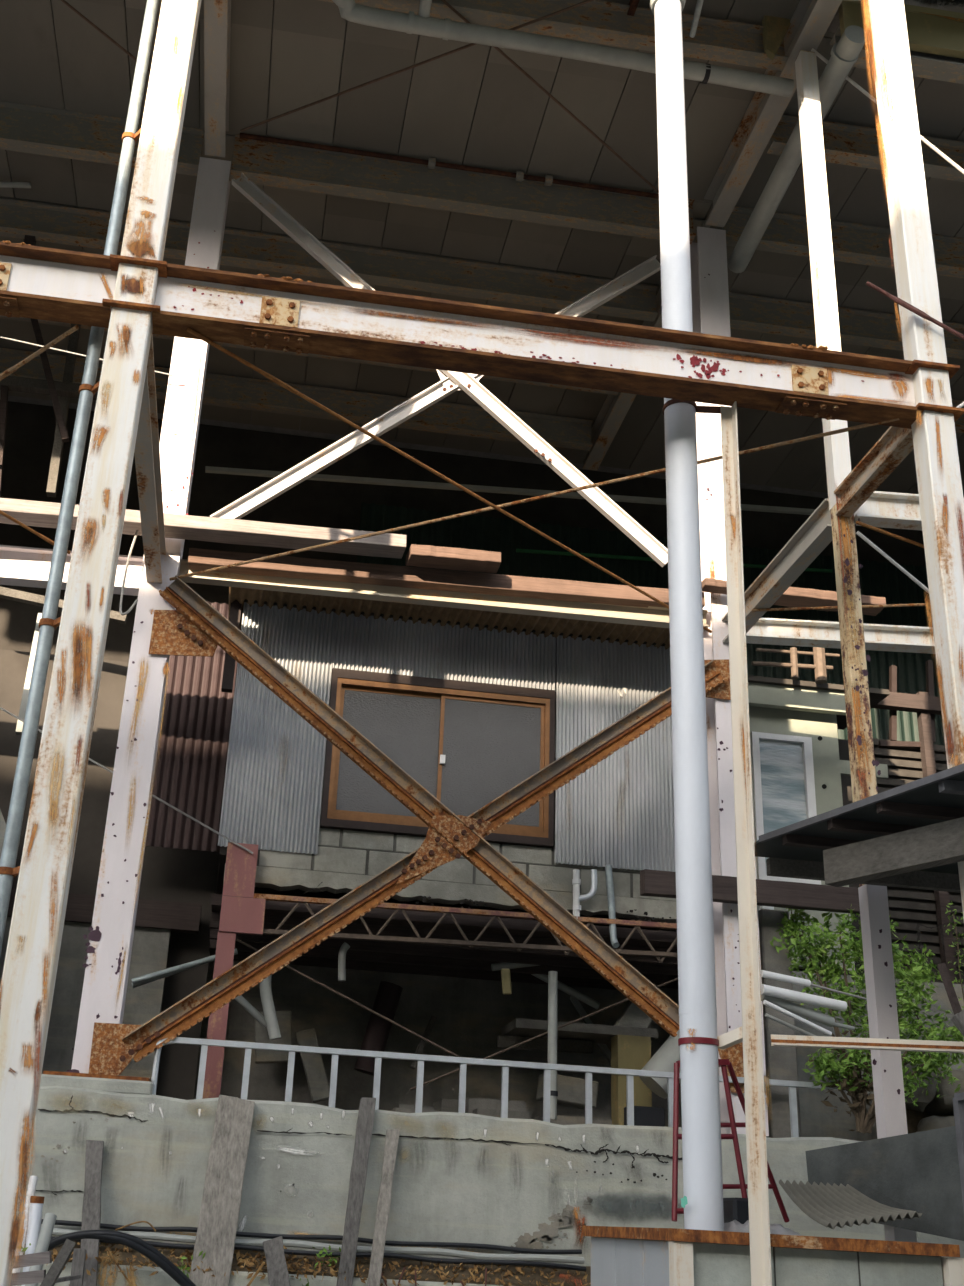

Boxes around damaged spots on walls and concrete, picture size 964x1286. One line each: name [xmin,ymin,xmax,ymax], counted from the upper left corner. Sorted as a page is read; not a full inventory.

corrosion [862,0,876,77]
corrosion [357,309,486,327]
corrosion [688,350,795,366]
corrosion [916,378,943,469]
corrosion [943,495,964,570]
corrosion [57,584,104,706]
corrosion [9,956,48,1091]
crack [38,1095,148,1122]
crack [257,1129,683,1165]
corrosion [10,1114,34,1264]
spalling [511,1196,593,1254]
damp [598,1188,672,1217]